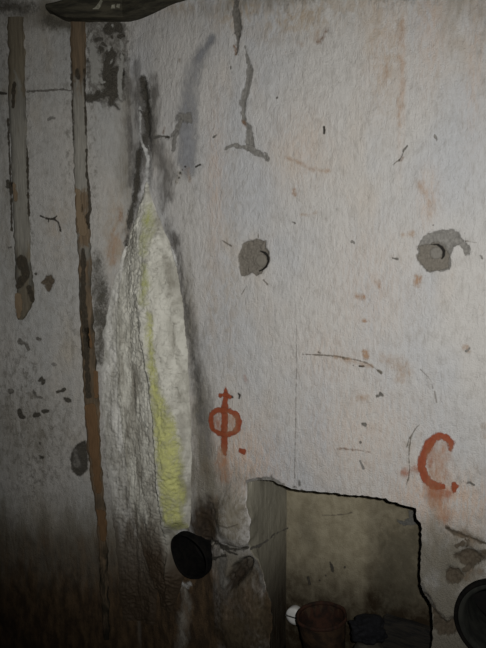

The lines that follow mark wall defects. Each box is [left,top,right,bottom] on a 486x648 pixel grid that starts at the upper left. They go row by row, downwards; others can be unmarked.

crack [232,0,242,55]
leakage [151,85,197,200]
spalling [239,236,270,285]
spalling [417,225,470,273]
leakage [92,258,107,364]
crack [211,528,288,560]